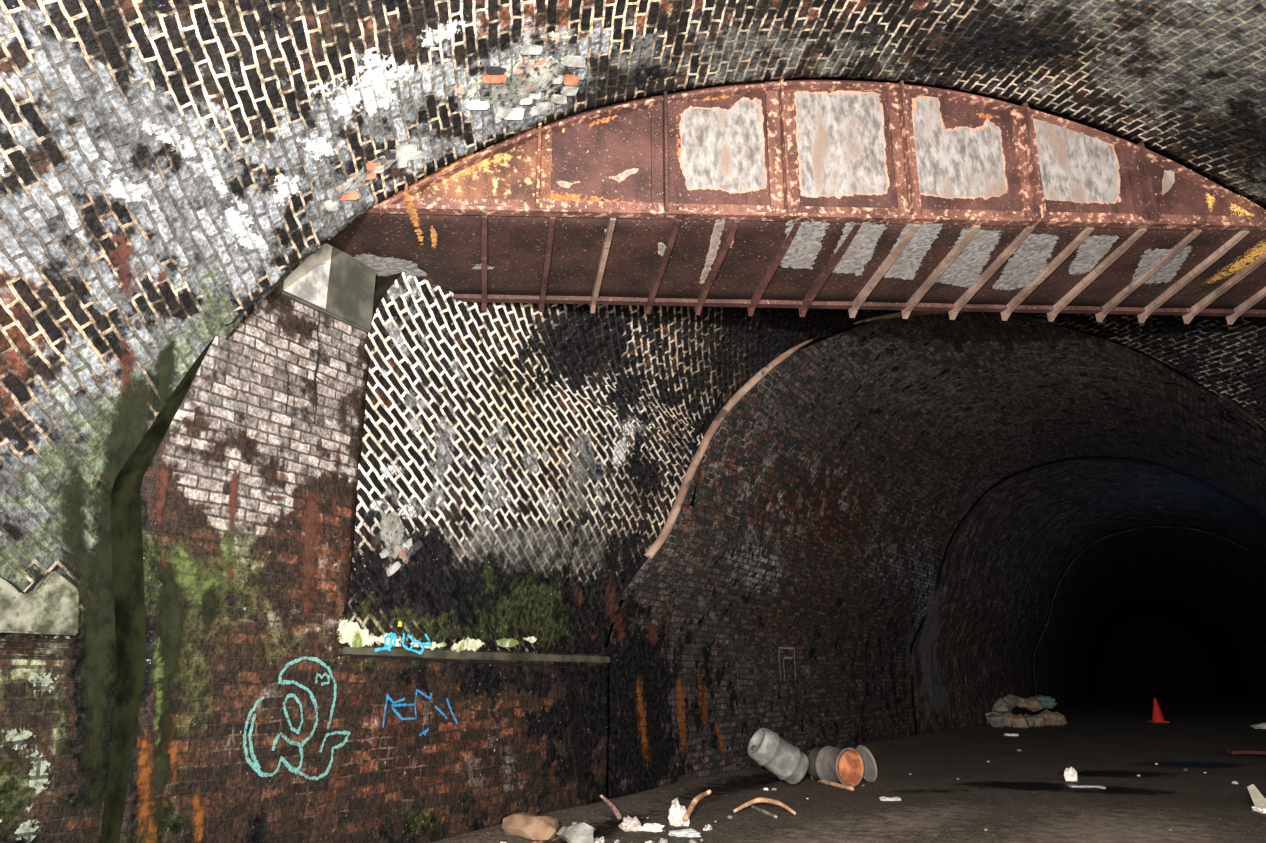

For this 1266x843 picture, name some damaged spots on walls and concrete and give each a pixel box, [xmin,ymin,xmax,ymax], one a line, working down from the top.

efflorescence [421,20,465,51]
efflorescence [308,48,414,120]
efflorescence [143,121,268,251]
efflorescence [273,175,299,206]
rust [397,150,512,250]
rust [551,191,625,202]
peeling [679,97,767,194]
peeling [793,90,890,199]
peeling [911,96,1008,200]
peeling [1033,119,1121,204]
rust [1204,191,1266,216]
rust [1202,239,1266,285]